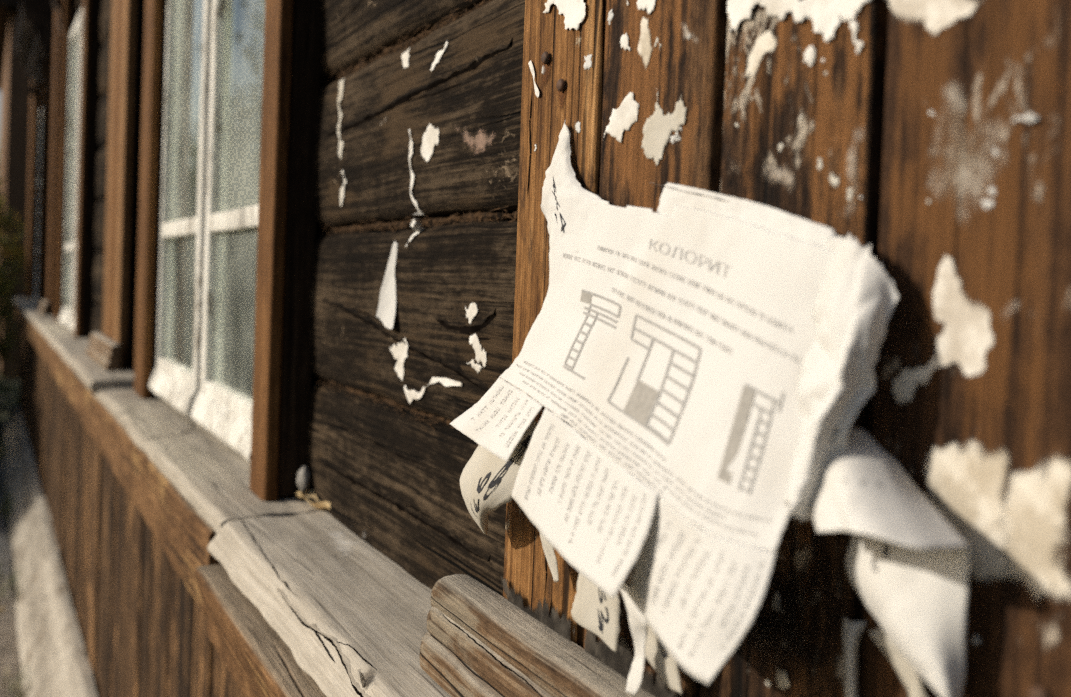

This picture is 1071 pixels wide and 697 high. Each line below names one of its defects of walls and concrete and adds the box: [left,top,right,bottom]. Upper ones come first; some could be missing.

crack [327,40,511,136]
crack [236,515,374,697]